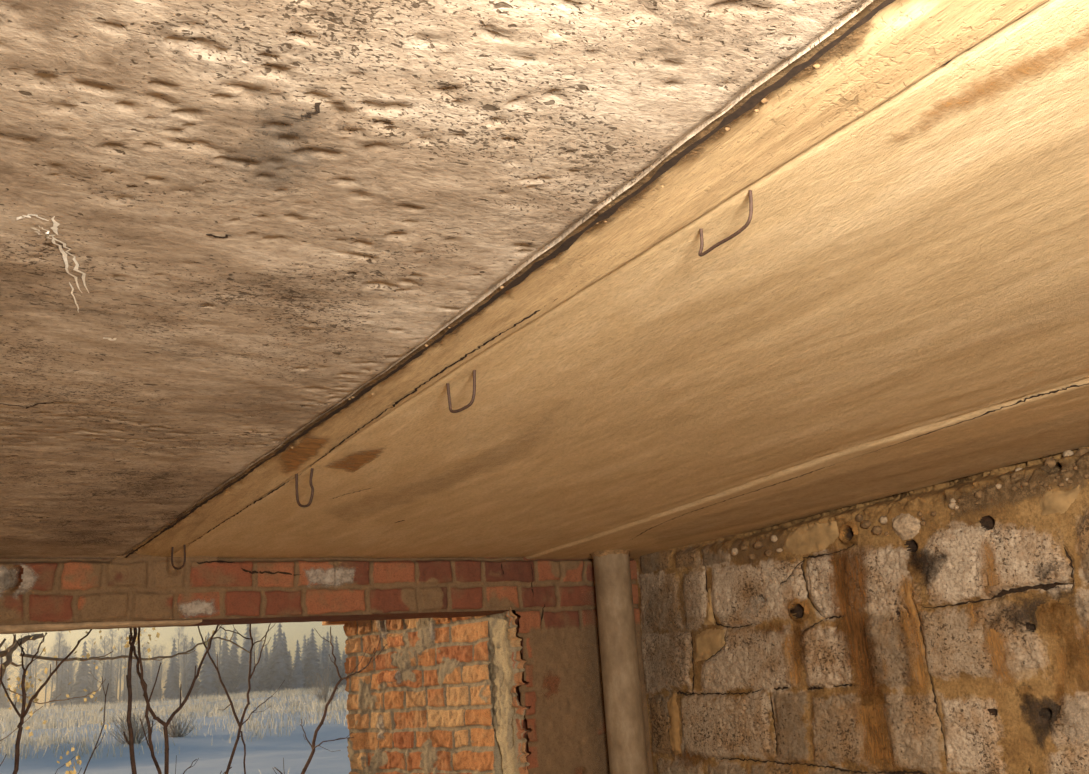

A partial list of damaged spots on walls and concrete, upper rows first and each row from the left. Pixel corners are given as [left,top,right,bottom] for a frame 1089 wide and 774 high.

water stain [919,39,1084,128]
crack [125,0,896,576]
crack [631,384,1087,540]
peeling [14,564,37,597]
crack [677,544,1089,774]